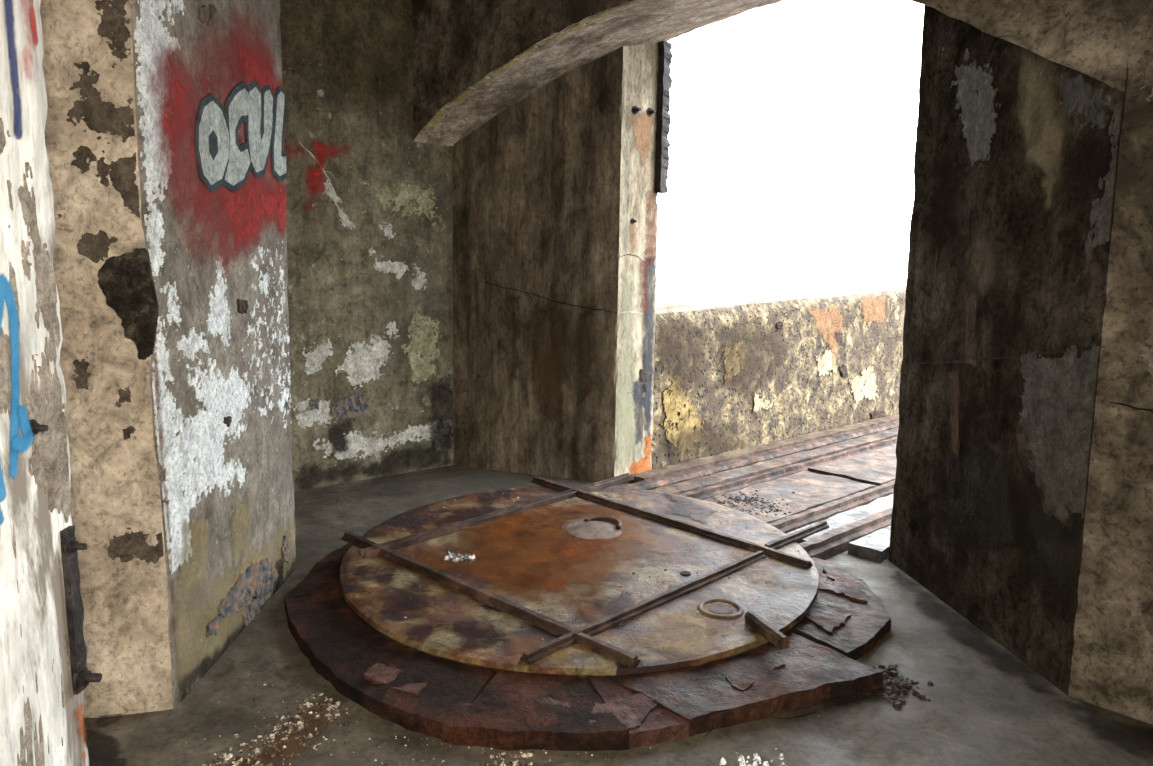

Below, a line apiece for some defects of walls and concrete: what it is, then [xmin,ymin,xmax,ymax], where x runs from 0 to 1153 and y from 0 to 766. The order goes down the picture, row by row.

peeling [941,46,1001,171]
peeling [1058,73,1123,283]
peeling [66,0,444,574]
rust [631,194,657,312]
rust [630,435,652,474]
peeling [17,664,63,766]
peeling [52,625,70,708]